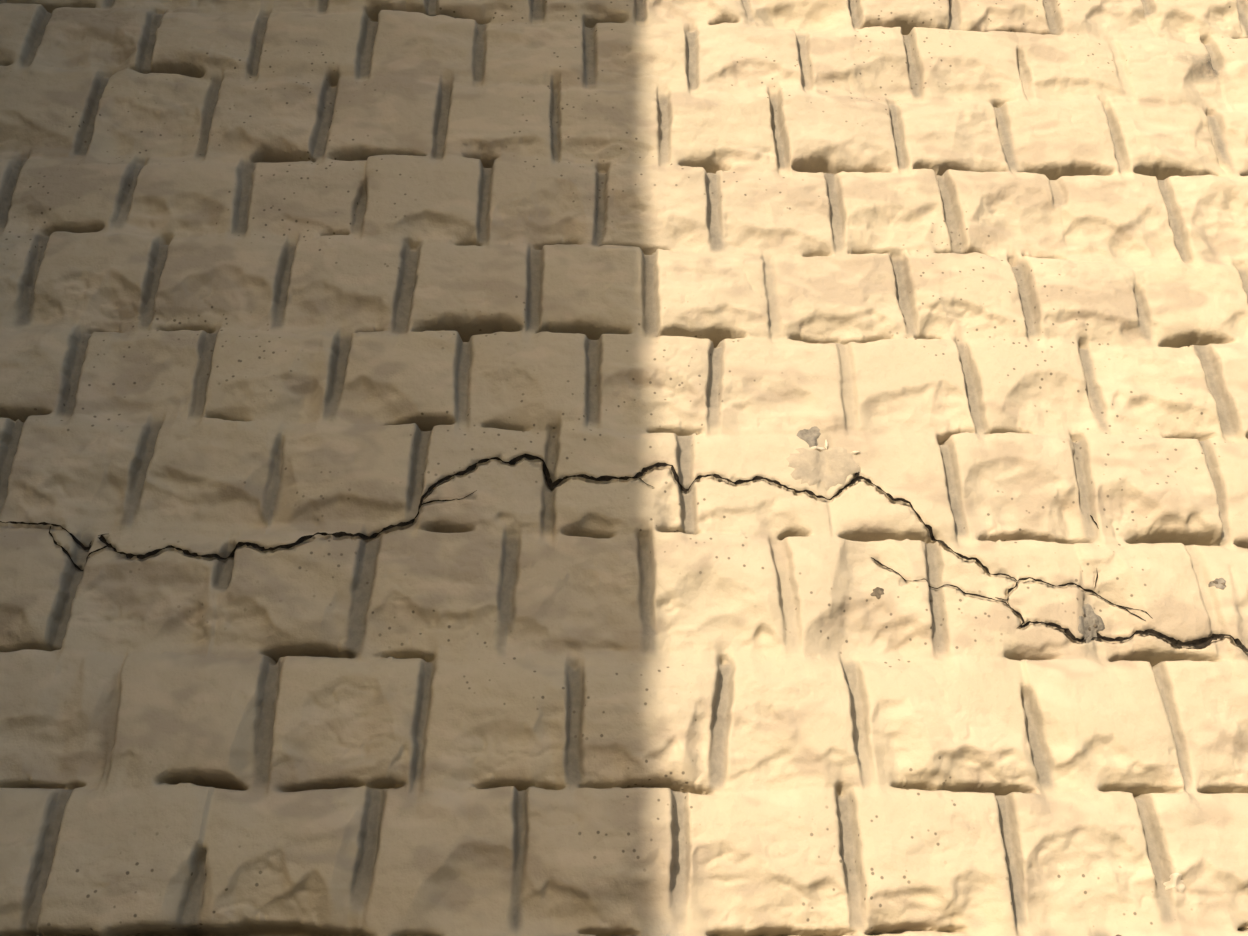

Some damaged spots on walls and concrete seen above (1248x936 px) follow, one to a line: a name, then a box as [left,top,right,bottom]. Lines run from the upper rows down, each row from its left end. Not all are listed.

crack [0,454,1248,652]